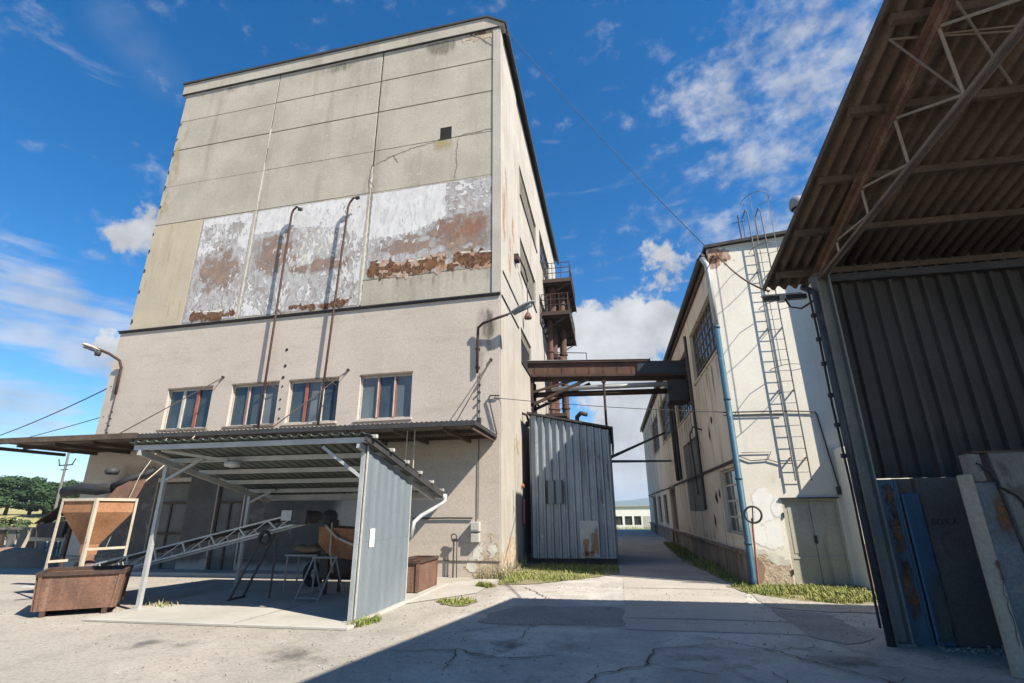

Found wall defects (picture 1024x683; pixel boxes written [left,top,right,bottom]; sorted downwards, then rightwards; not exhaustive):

crack [368,128,493,193]
peeling [182,176,492,324]
flaking render [464,533,520,578]
flaking render [753,548,794,586]
crack [394,624,614,670]